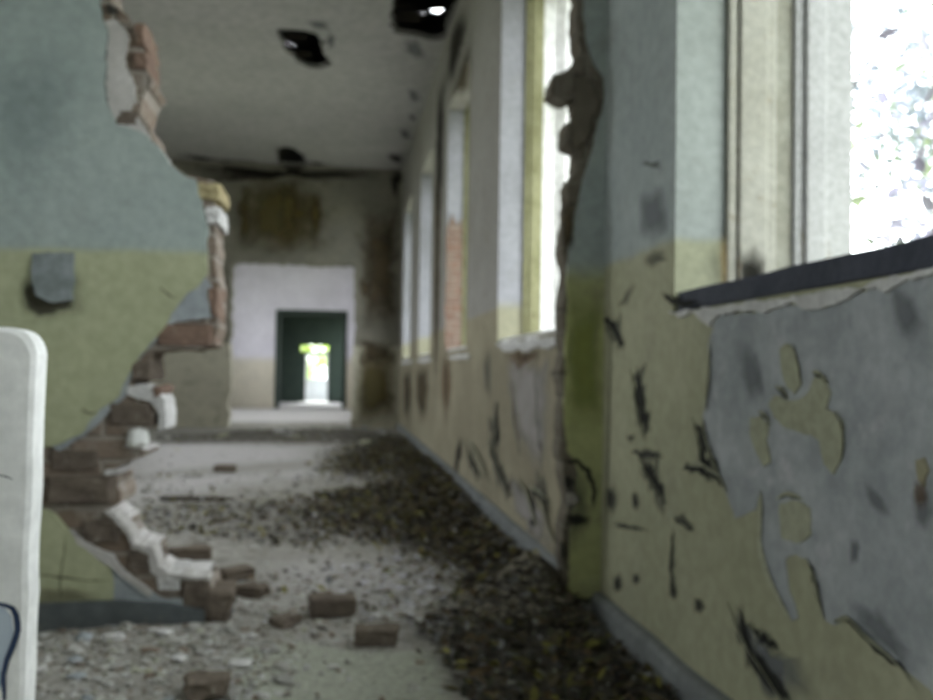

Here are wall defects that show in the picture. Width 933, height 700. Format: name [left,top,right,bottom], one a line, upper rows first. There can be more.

flaking render [116,110,148,125]
flaking render [558,73,600,174]
flaking render [197,183,230,235]
flaking render [25,252,75,315]
flaking render [156,287,227,349]
flaking render [108,360,175,427]
flaking render [495,336,556,458]
flaking render [44,449,133,504]
spalling [213,464,237,473]
peeling [669,267,933,693]
flaking render [81,519,120,544]
flaking render [129,540,271,608]